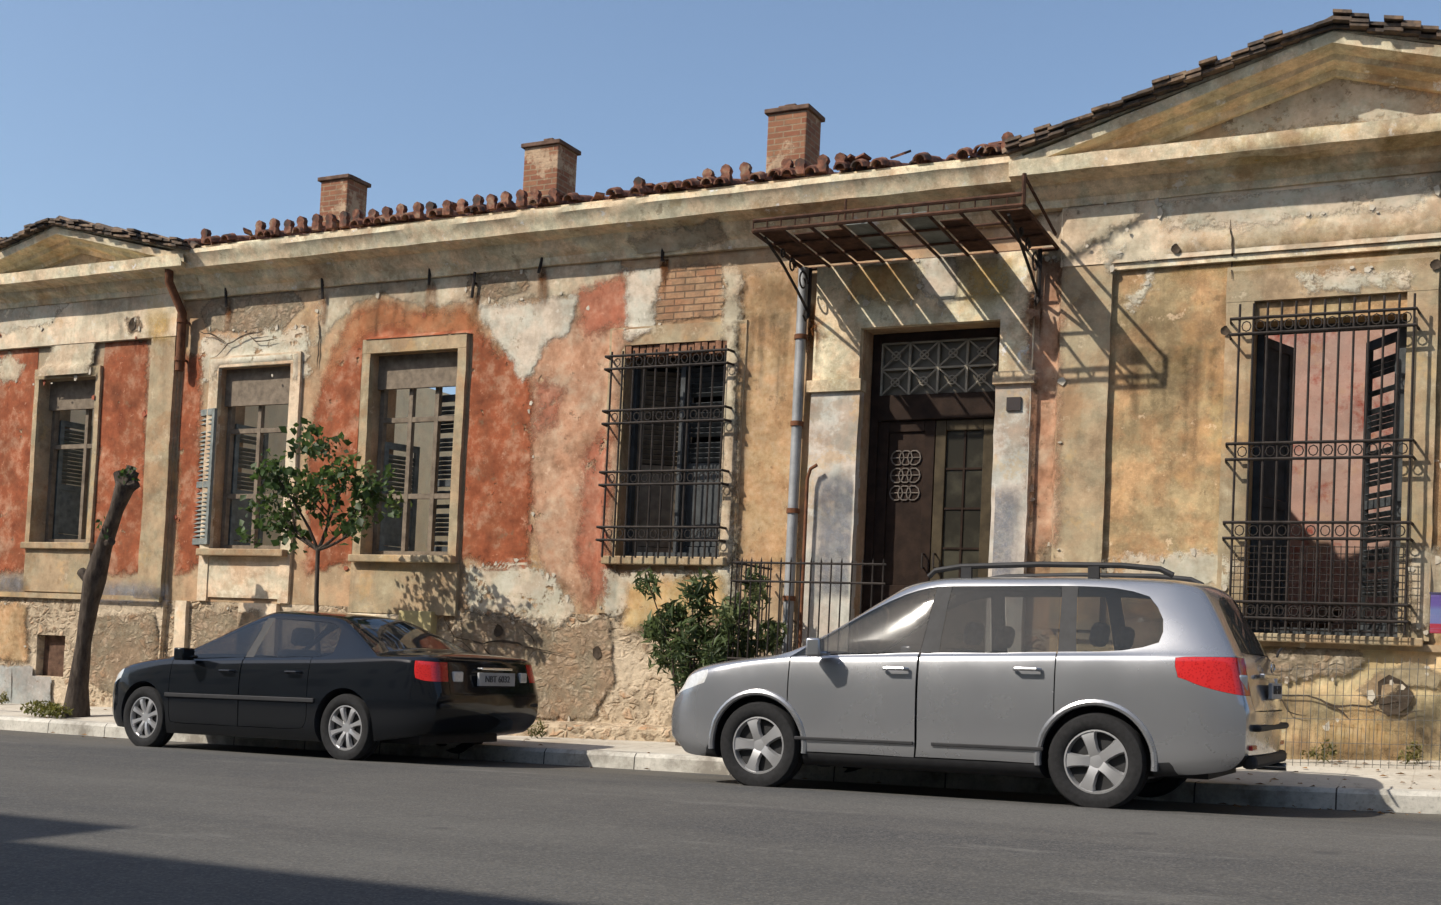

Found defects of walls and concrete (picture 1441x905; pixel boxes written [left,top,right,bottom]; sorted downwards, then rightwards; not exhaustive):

peeling [0,303,150,577]
peeling [173,260,739,721]
peeling [1408,547,1441,635]